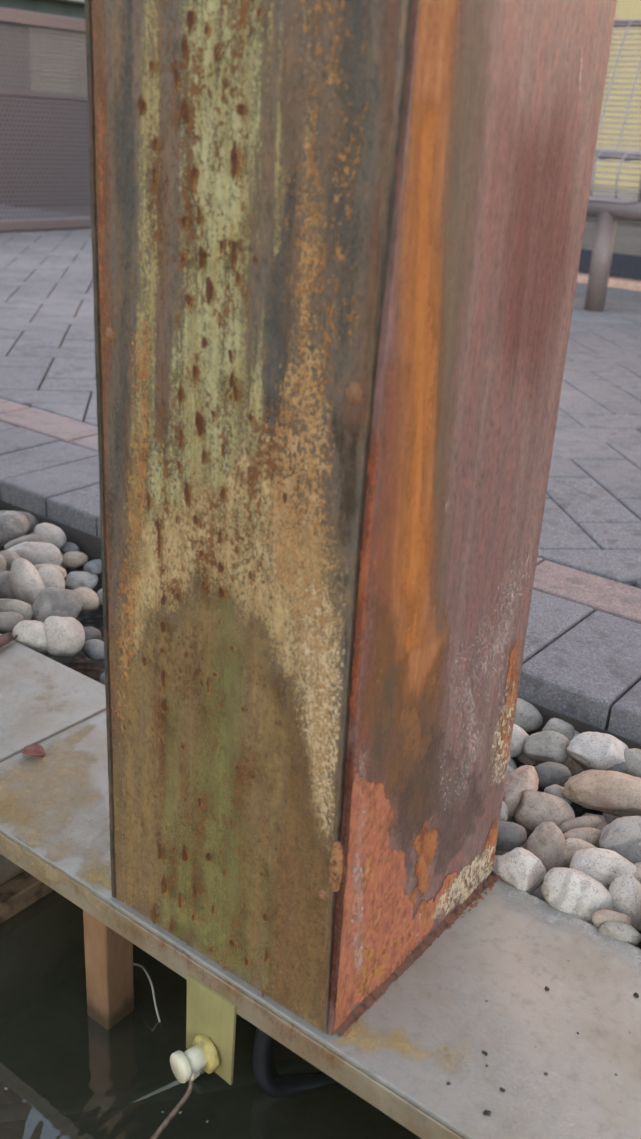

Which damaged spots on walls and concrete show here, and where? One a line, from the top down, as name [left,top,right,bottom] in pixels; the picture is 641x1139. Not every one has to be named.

rust [95,18,111,419]
rust [137,0,296,975]
rust [438,820,498,938]
rust [499,642,519,767]